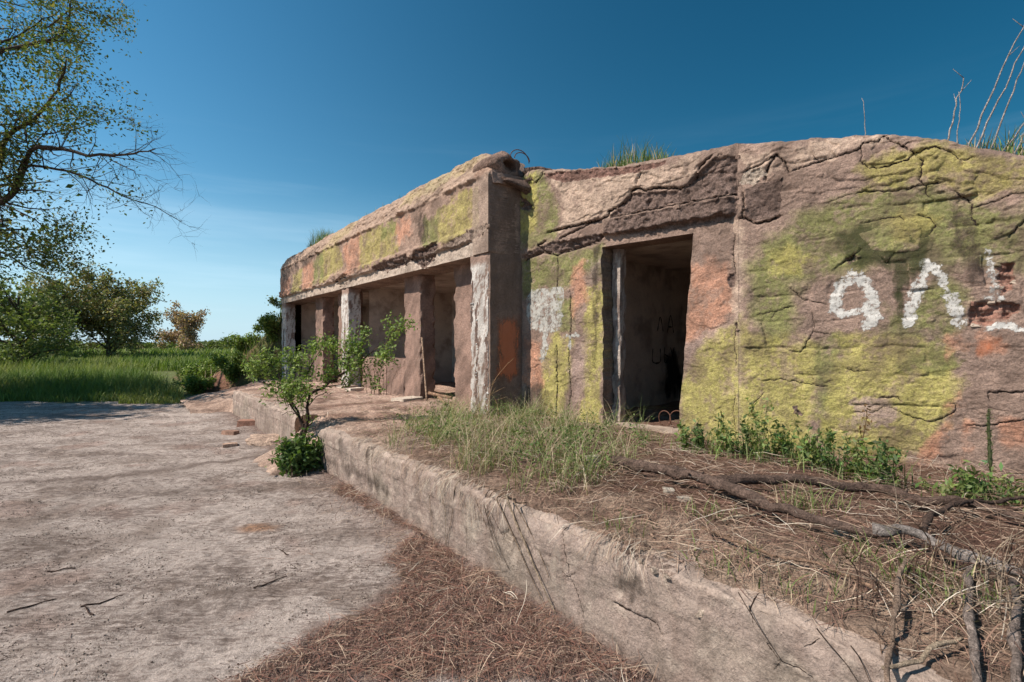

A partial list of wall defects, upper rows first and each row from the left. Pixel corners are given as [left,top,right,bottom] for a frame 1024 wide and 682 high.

spalling [520,154,783,259]
spalling [372,224,490,273]
crack [526,135,1024,416]
leakage [839,226,929,313]
spalling [968,262,1021,327]
corrosion [497,319,519,380]
crack [856,391,1024,427]